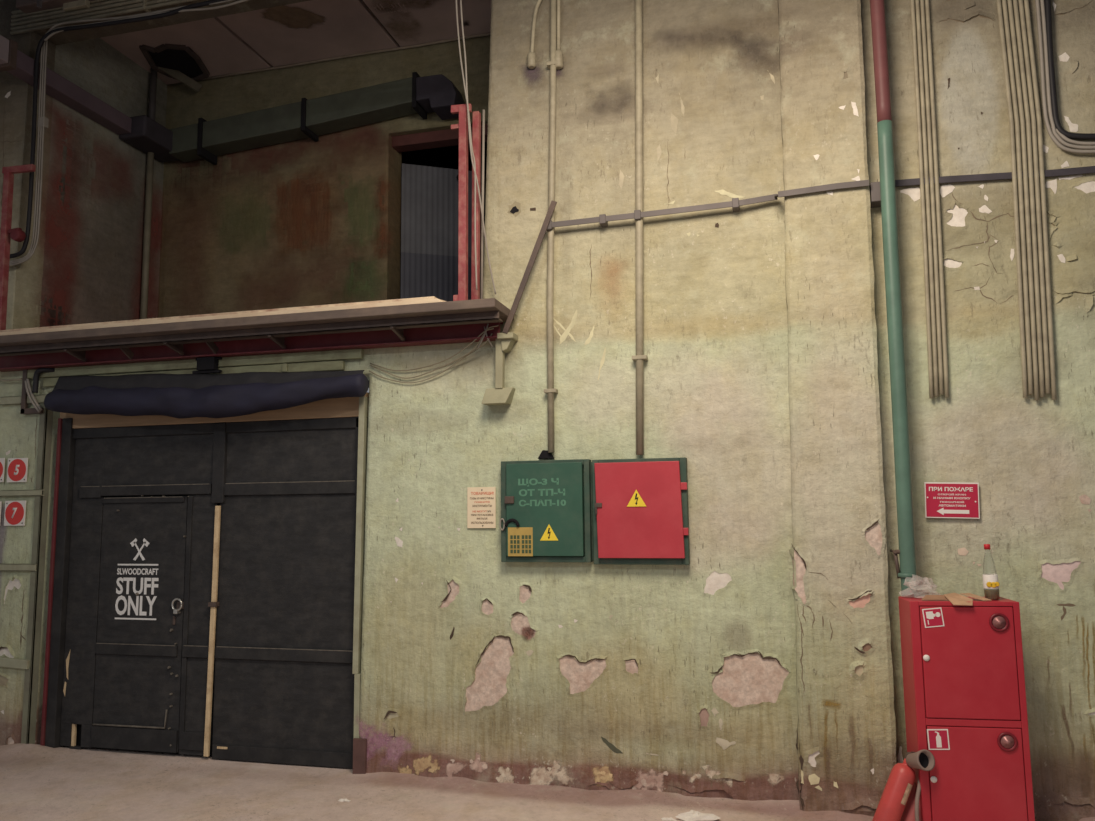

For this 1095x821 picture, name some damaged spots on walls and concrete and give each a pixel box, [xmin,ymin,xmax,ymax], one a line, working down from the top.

water stain [263,5,324,28]
crack [934,0,997,23]
spalling [139,44,210,82]
peeling [1064,116,1078,132]
peeling [1045,161,1095,197]
crack [945,194,1014,303]
crack [1047,207,1095,313]
flaking render [462,582,540,716]
flaking render [556,652,641,697]
flaking render [696,649,792,750]
peeling [398,753,514,783]
peeling [529,760,573,787]